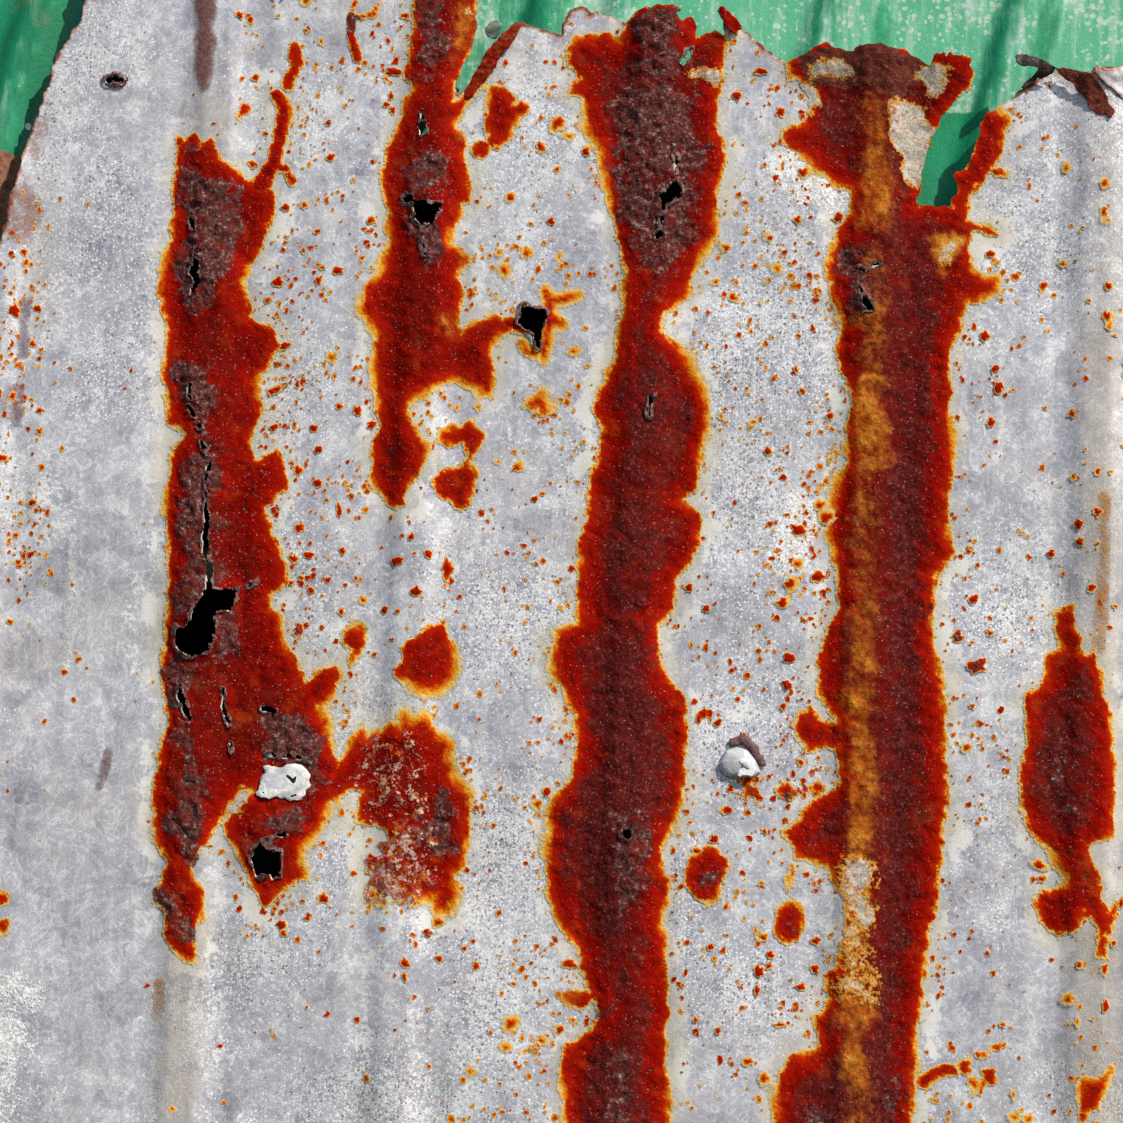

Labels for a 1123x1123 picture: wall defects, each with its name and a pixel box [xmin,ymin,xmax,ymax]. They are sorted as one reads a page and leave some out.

rust [192,0,217,95]
rust [234,9,264,50]
rust [235,98,252,125]
rust [1039,281,1057,298]
rust [724,317,760,349]
rust [1086,298,1122,337]
rust [493,449,526,491]
rust [495,527,557,566]
rust [689,624,801,702]
rust [965,657,992,674]
rust [461,939,481,971]
rust [441,1092,531,1123]